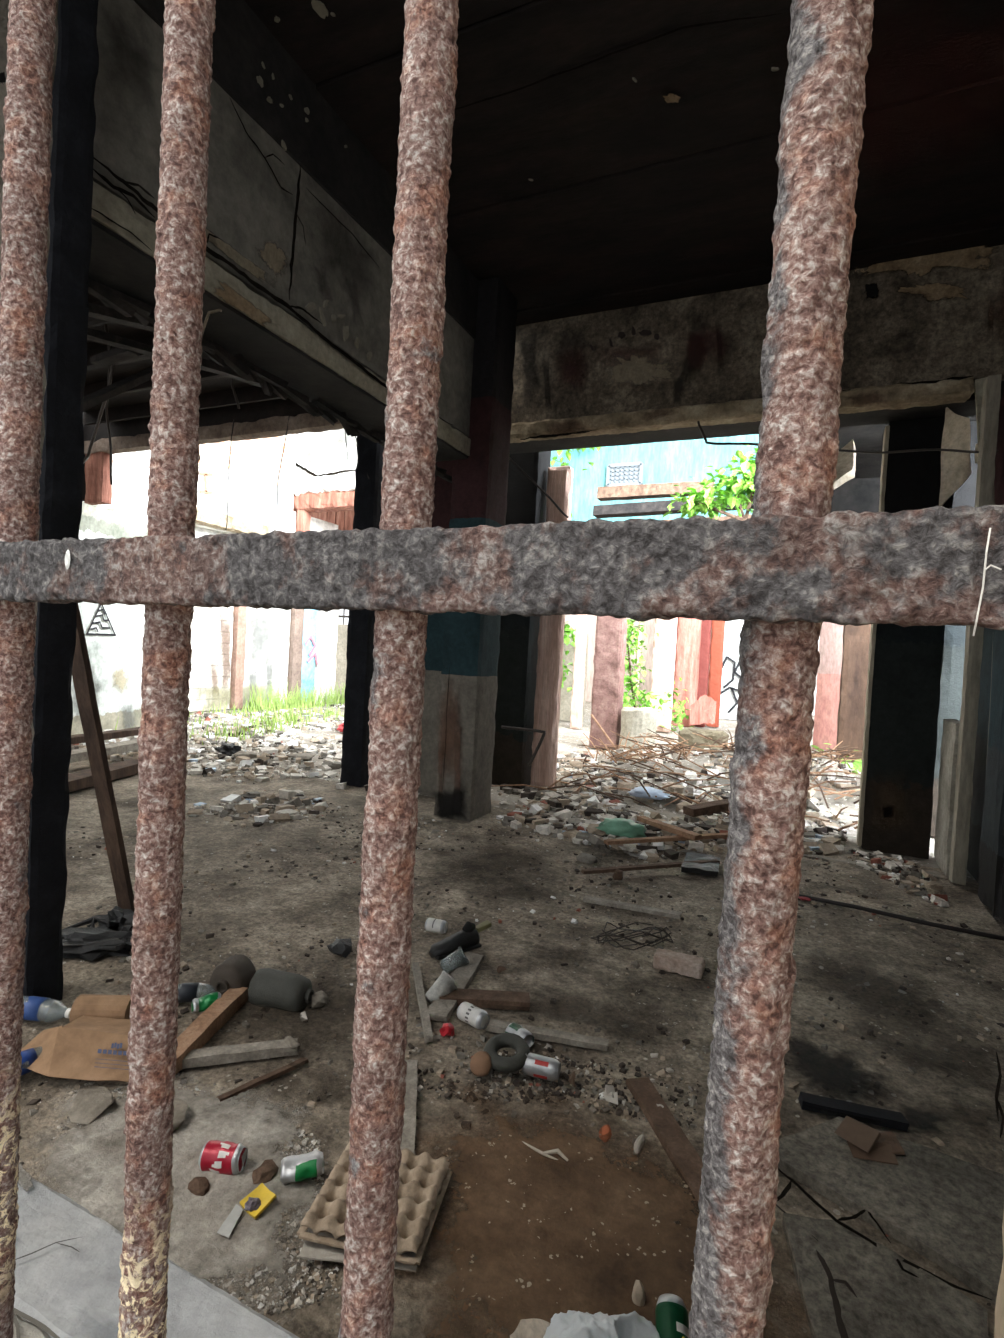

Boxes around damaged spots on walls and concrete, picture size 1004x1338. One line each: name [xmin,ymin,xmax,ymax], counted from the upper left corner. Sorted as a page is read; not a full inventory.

peeling [311,0,335,19]
crack [92,157,158,251]
crack [206,97,387,388]
rust [114,670,126,689]
rust [212,613,231,690]
crack [995,1052,1004,1138]
crack [776,1168,992,1338]